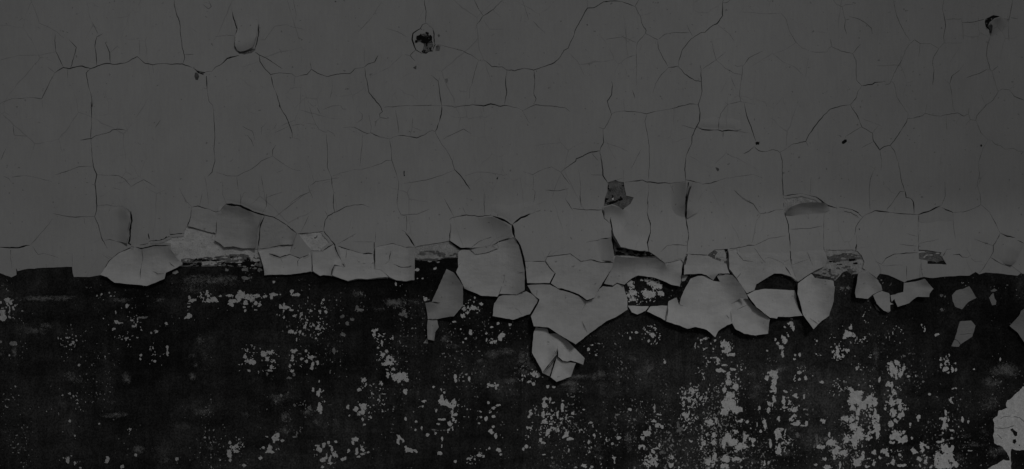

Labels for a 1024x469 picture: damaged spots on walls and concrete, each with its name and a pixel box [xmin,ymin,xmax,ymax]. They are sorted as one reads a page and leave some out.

spalling [410,22,440,55]
crack [0,0,1023,331]
spalling [0,288,23,321]
peeling [96,180,976,469]
peeling [1010,309,1024,342]
peeling [988,386,1024,469]